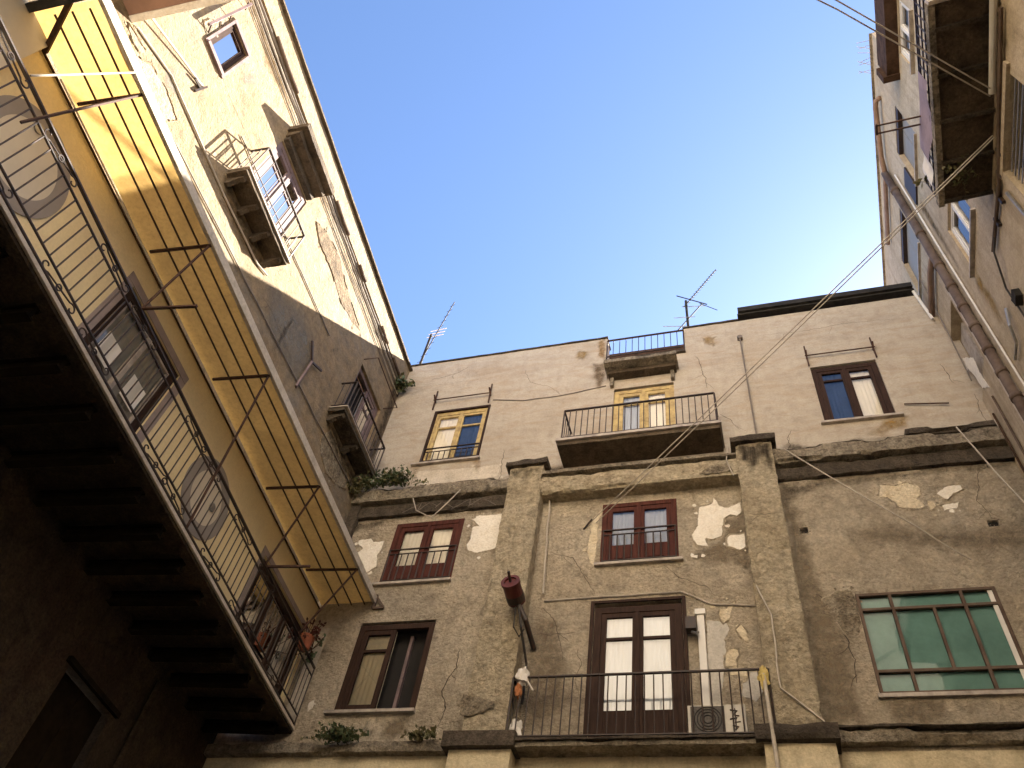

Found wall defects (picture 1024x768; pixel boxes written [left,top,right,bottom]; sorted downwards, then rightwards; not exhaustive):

peeling [877,481,965,516]
peeling [354,537,385,575]
peeling [465,514,502,559]
peeling [690,498,747,558]
spalling [710,597,750,682]
crack [837,635,857,686]
crack [438,650,460,726]